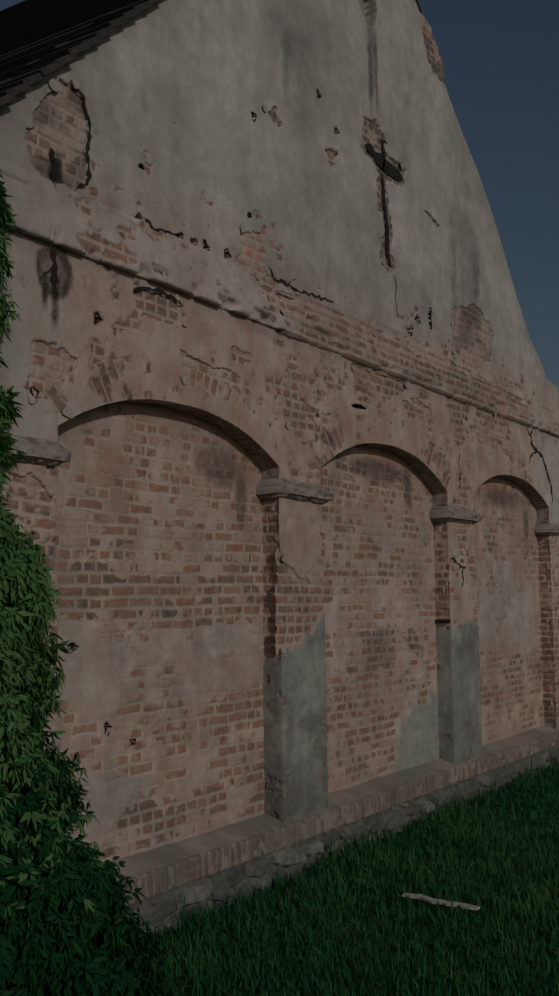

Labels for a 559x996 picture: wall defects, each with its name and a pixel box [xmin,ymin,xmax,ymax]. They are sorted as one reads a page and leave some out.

spalling [421,13,445,83]
flaking render [25,79,89,197]
flaking render [361,119,405,273]
flaking render [224,212,268,280]
flaking render [132,284,188,327]
crack [267,264,334,303]
flaking render [451,304,493,370]
flaking render [24,341,77,419]
crack [527,427,553,502]